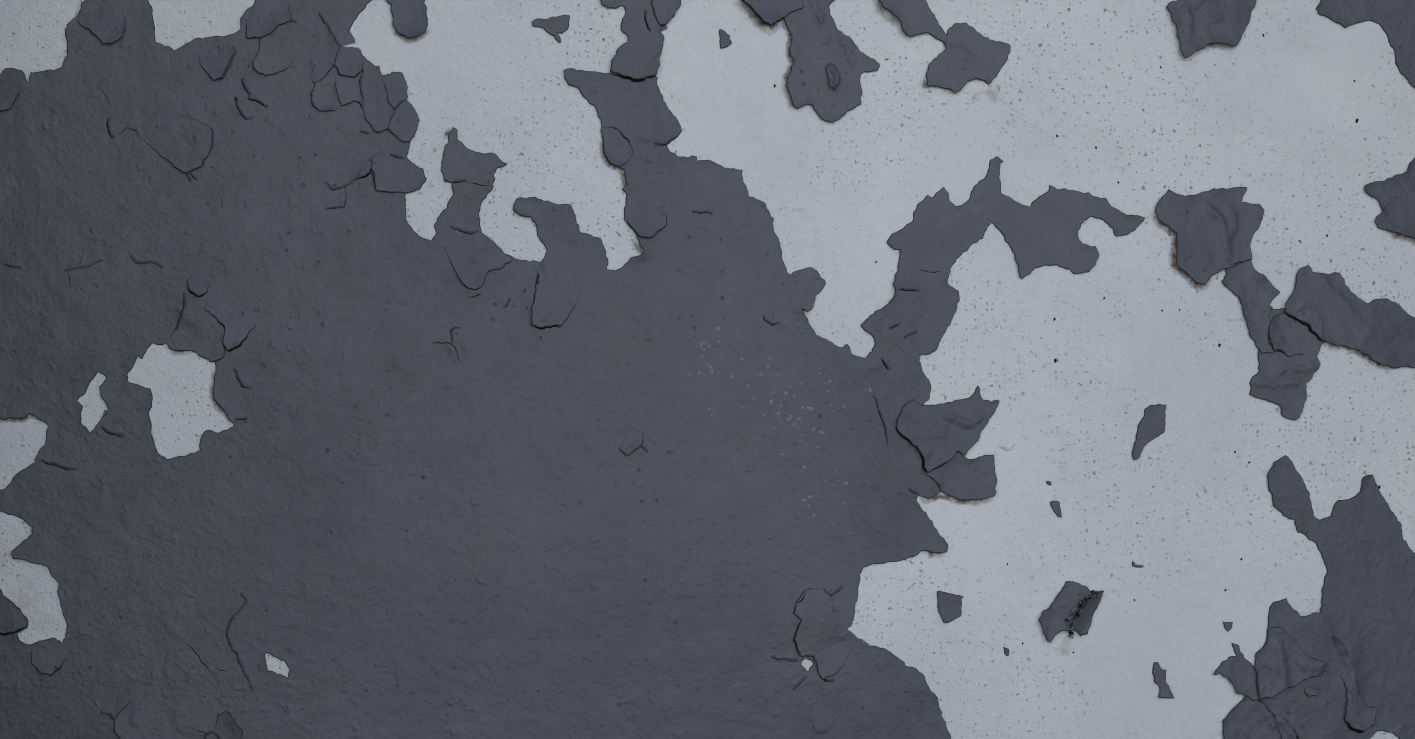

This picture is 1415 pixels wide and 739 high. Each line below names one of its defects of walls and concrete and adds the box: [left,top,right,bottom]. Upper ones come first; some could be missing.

peeling [0,0,126,111]
peeling [0,414,49,489]
peeling [77,372,108,432]
peeling [128,273,257,459]
peeling [309,0,1415,739]
peeling [0,511,67,675]
crack [100,592,256,739]
peeling [265,653,289,677]